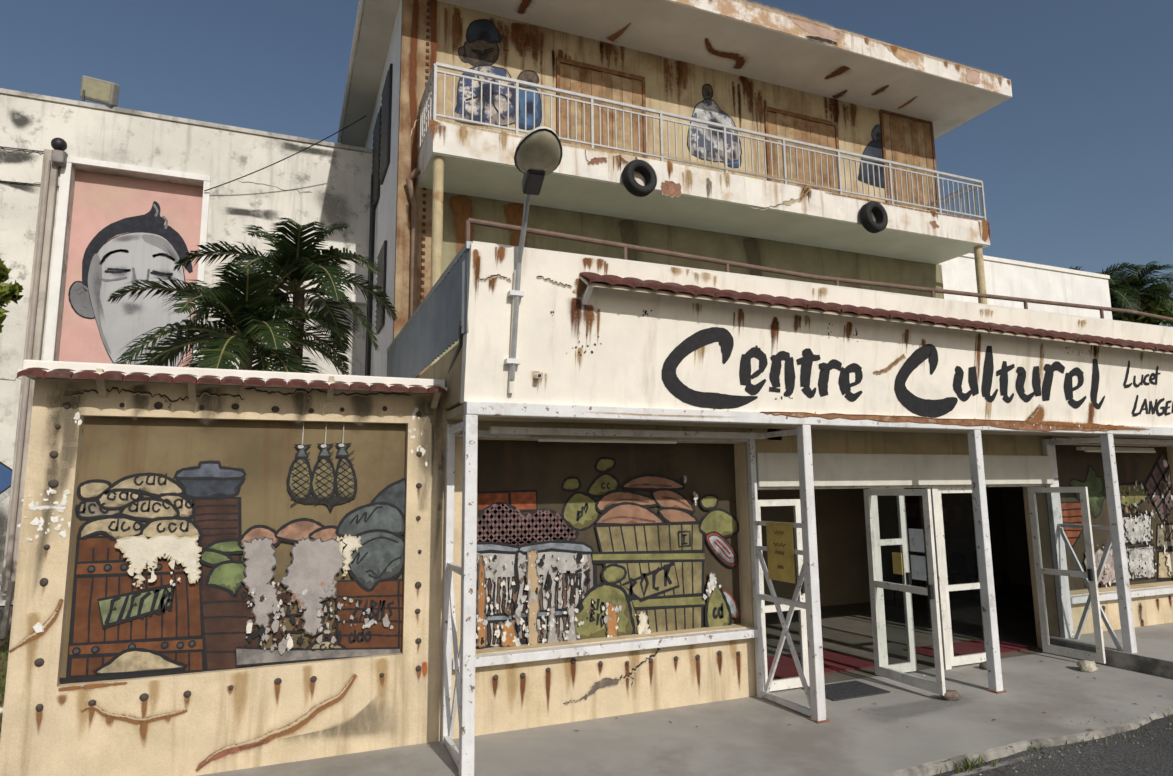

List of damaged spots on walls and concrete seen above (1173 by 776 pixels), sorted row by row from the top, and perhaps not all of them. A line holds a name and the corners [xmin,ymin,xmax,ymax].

corrosion [408,0,527,304]